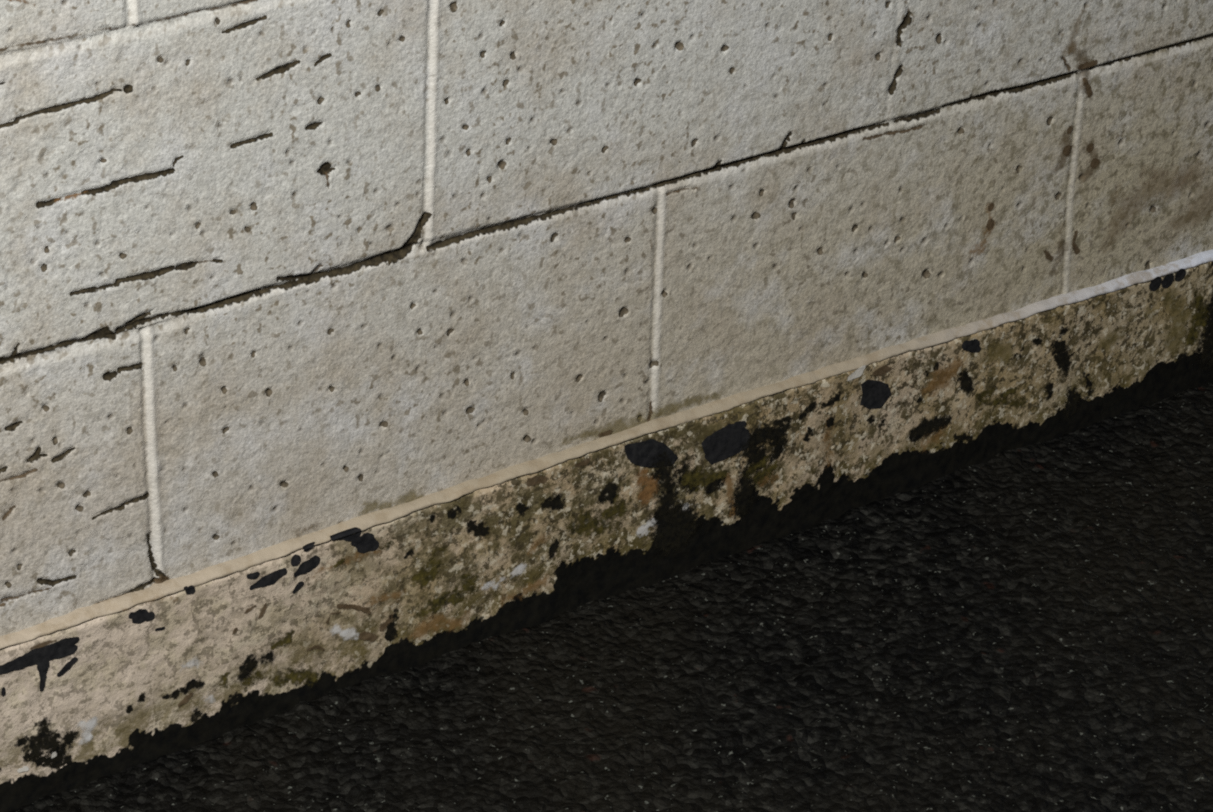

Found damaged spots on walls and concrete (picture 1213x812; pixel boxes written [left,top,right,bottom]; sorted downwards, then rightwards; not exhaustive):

crack [103,0,257,30]
crack [0,10,1213,364]
spalling [70,259,223,296]
peeling [1146,261,1186,291]
spalling [103,362,142,381]
peeling [848,365,891,410]
peeling [624,439,703,557]
peeling [330,527,379,553]
leakage [0,261,1213,812]
peeling [246,542,320,593]
peeling [129,609,165,631]
peeling [0,637,79,696]